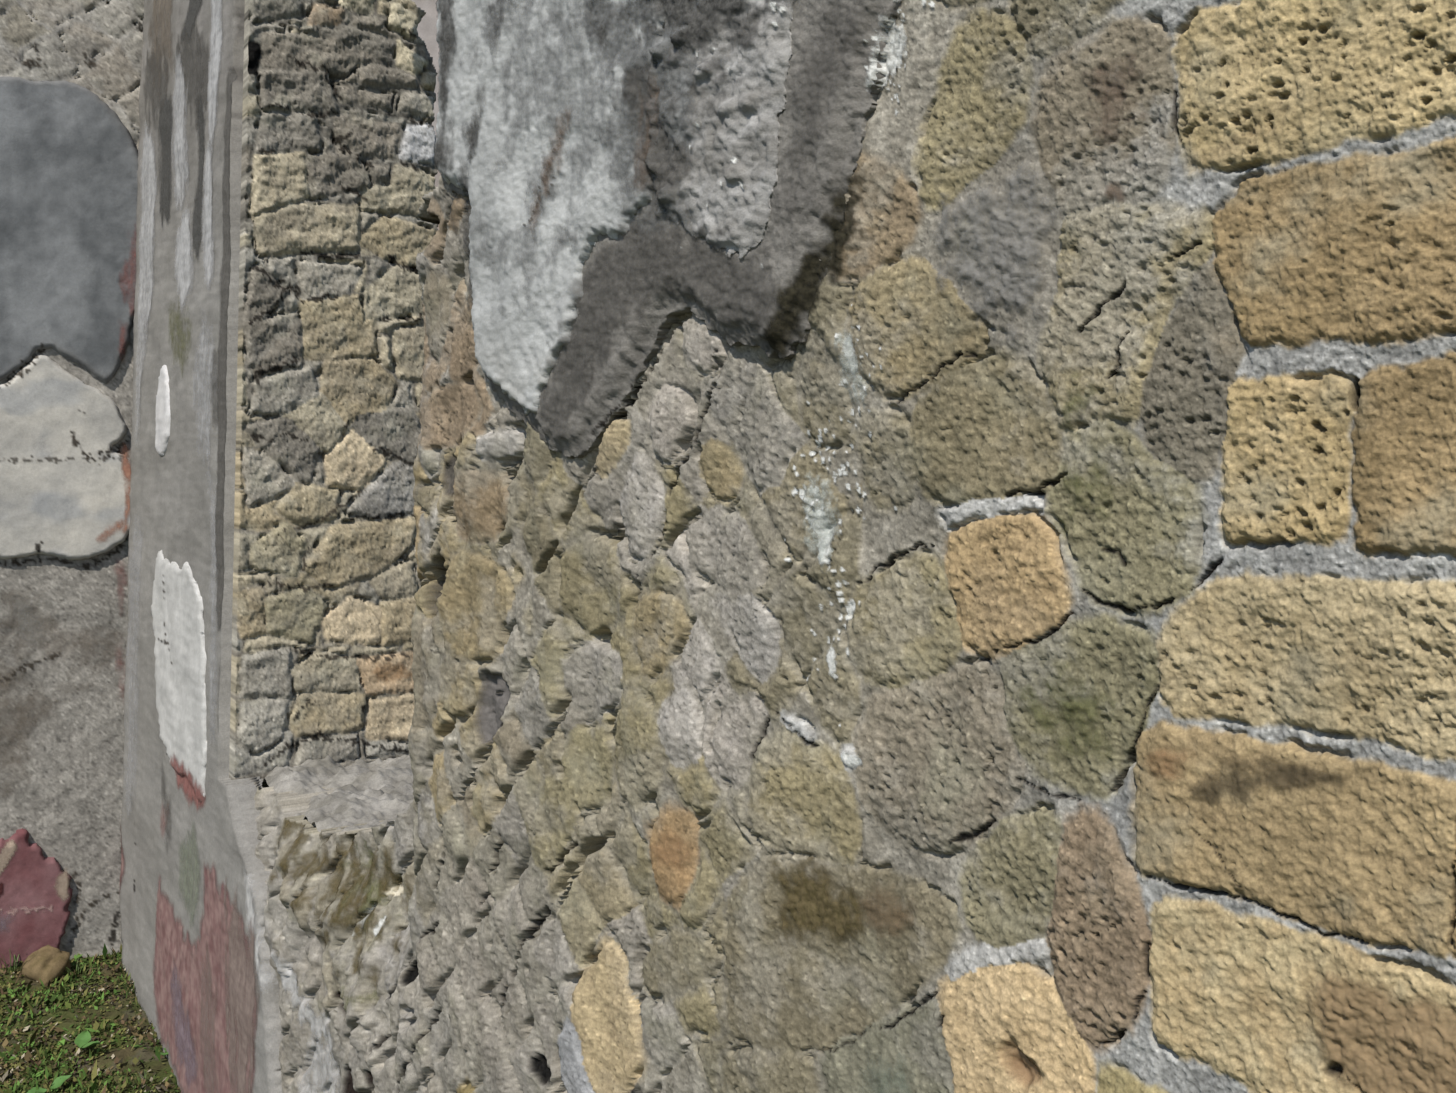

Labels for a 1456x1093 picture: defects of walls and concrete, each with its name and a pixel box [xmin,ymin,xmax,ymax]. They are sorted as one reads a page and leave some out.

flaking render [435,0,902,459]
crack [1176,243,1202,257]
crack [899,351,978,403]
crack [1081,286,1130,378]
water stain [792,325,882,681]
water stain [841,752,862,767]